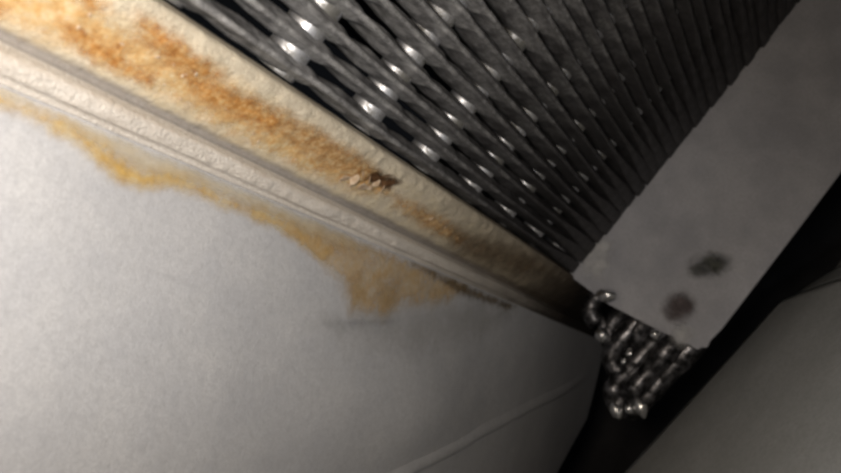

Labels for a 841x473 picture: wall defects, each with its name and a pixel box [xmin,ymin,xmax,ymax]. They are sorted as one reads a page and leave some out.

corrosion [0,0,399,194]
water stain [54,115,457,312]
corrosion [445,279,511,310]